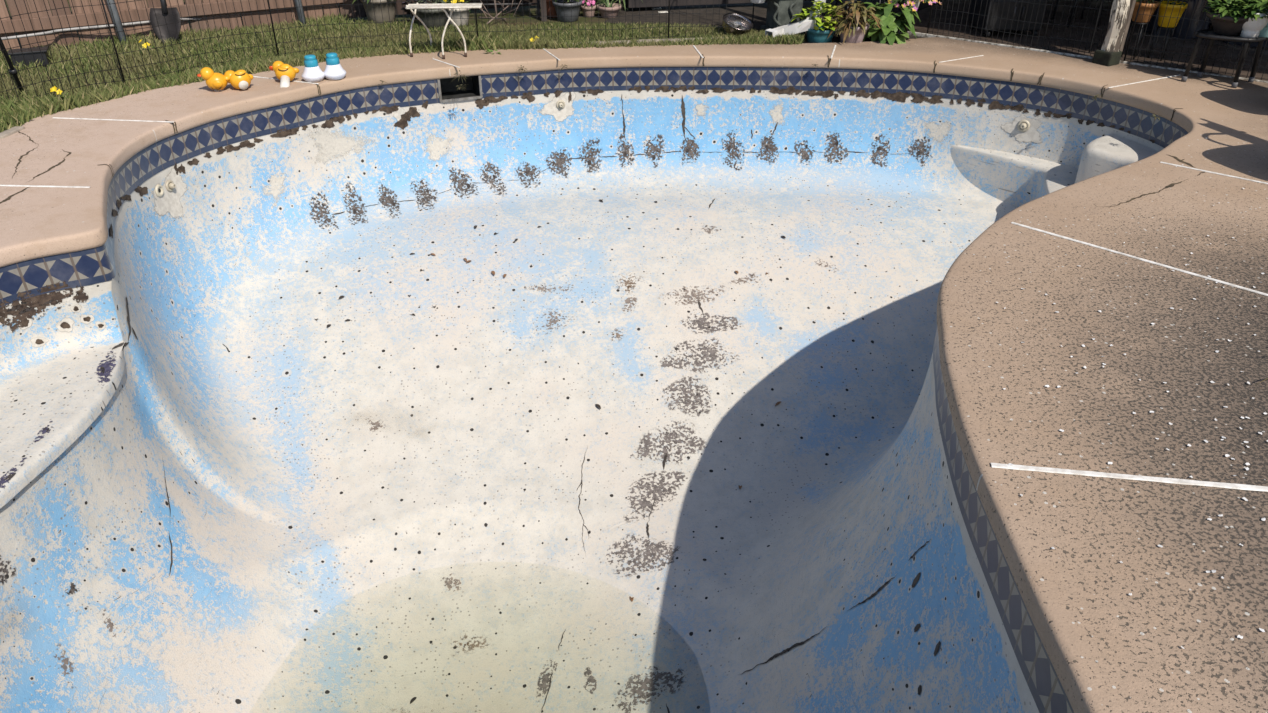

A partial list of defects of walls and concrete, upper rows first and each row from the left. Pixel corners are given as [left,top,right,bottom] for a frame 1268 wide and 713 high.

crack [0,131,72,203]
spalling [174,101,428,175]
spalling [475,89,604,109]
crack [542,96,865,172]
spalling [628,85,1131,170]
crack [1109,155,1205,207]
spalling [0,282,106,347]
crack [112,297,138,349]
crack [162,457,173,576]
crack [577,447,589,551]
crack [738,539,931,675]